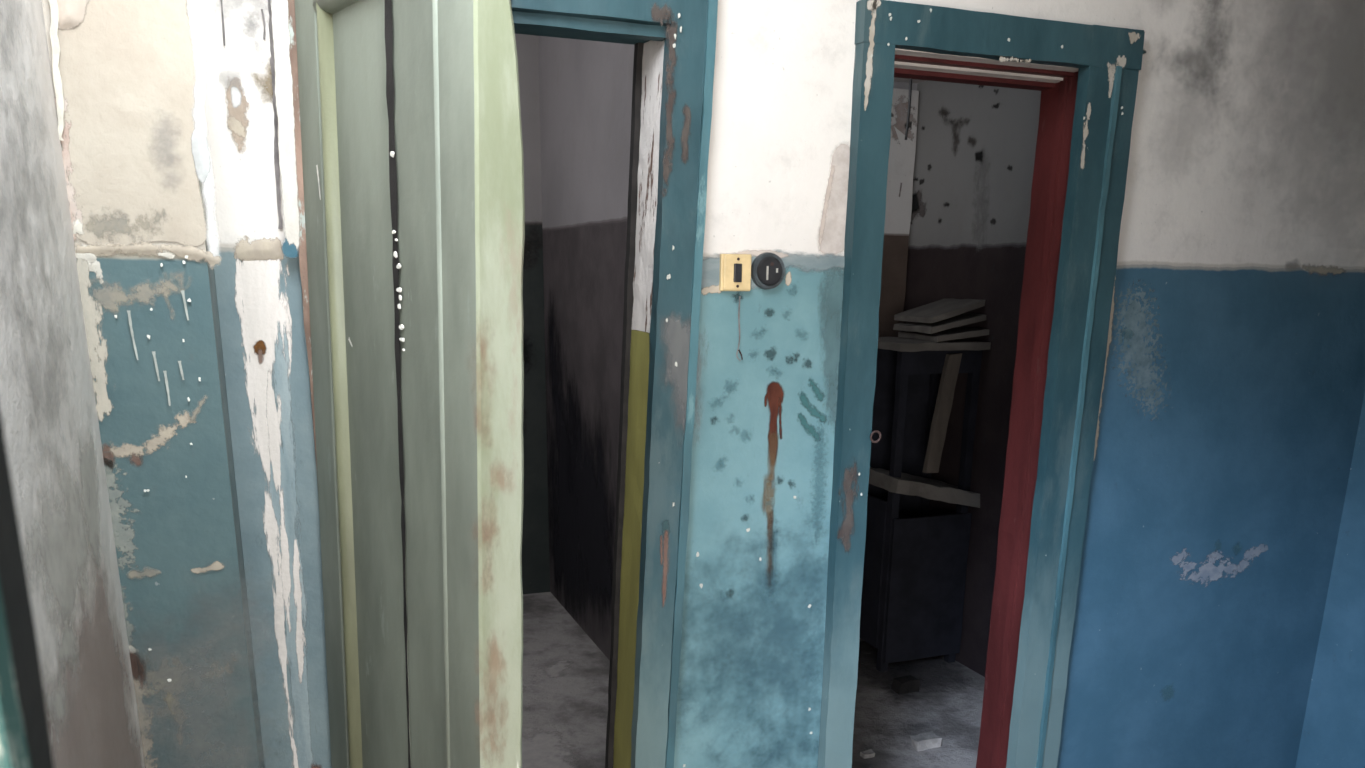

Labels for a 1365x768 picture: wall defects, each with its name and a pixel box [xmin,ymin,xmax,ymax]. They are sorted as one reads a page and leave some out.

damp [48,558,142,768]
spalling [54,0,314,768]
damp [705,563,819,696]
rust [763,382,784,572]
peeling [1170,544,1268,587]